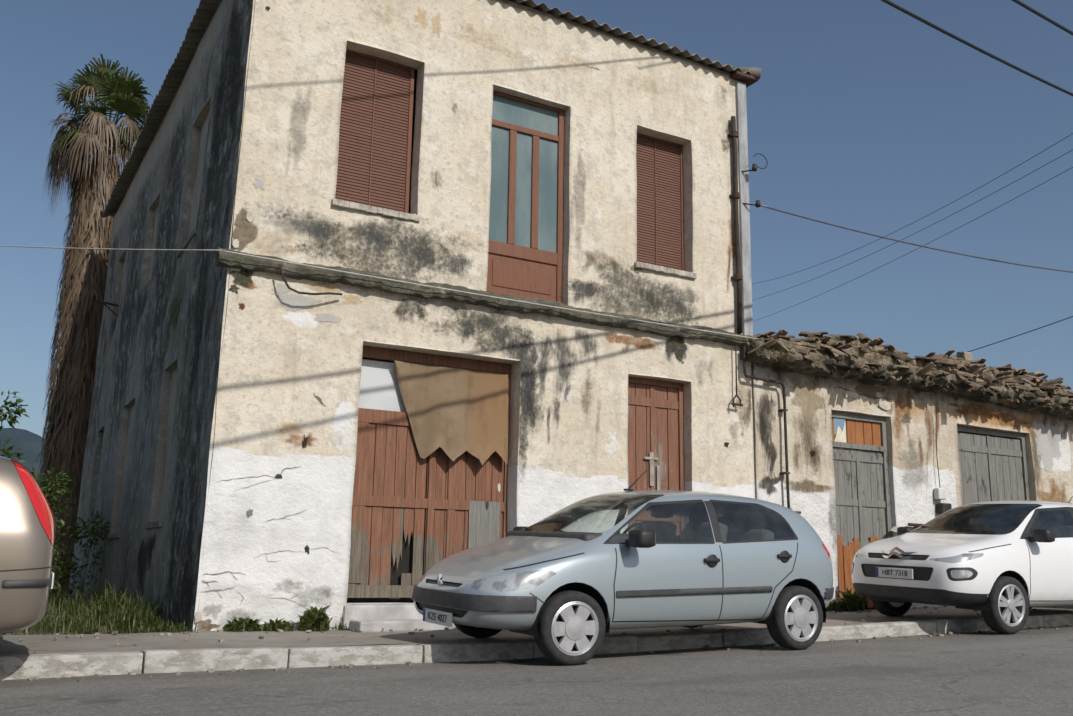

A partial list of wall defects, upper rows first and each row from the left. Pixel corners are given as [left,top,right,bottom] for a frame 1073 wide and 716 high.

spalling [232,208,258,251]
leakage [279,214,470,281]
leakage [396,299,424,319]
leakage [562,257,694,322]
leakage [665,336,687,363]
leakage [437,308,596,468]
spalling [740,329,1073,471]
leakage [737,390,779,494]
leakage [795,420,819,467]
crack [221,466,302,492]
leakage [792,481,829,492]
crack [202,547,336,602]